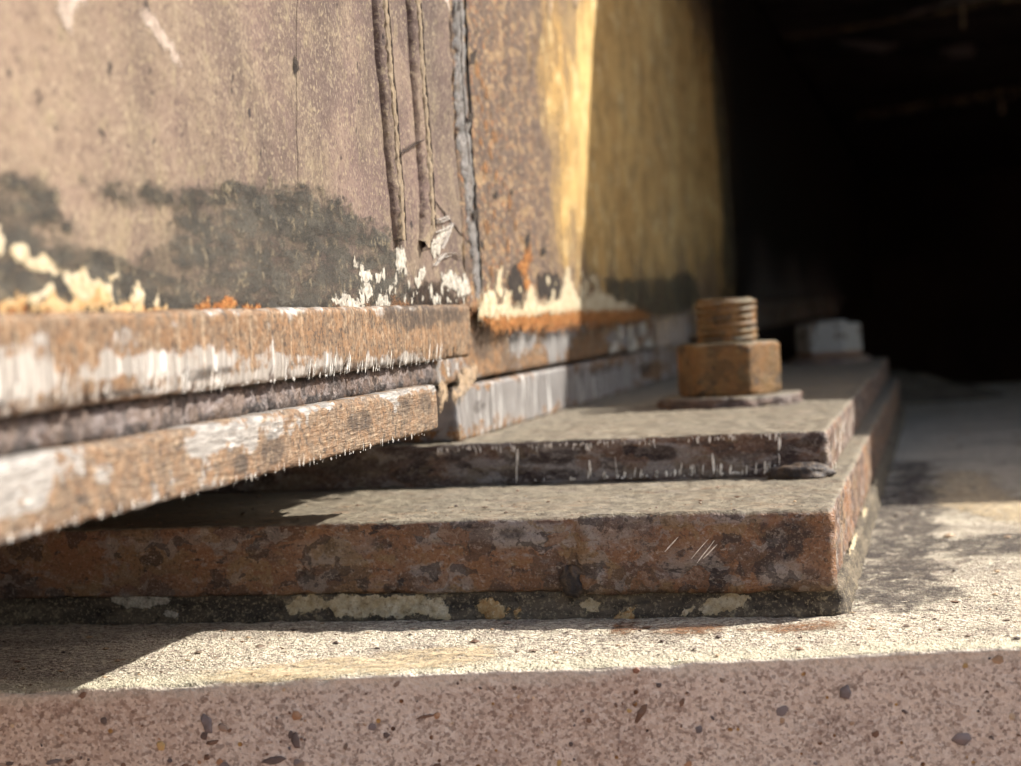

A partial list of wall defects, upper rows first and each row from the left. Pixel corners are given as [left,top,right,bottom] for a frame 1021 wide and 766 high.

crack [436,0,484,301]
damp [0,0,736,348]
corrosion [483,207,532,295]
spalling [508,264,524,306]
spalling [537,271,562,302]
corrosion [461,298,651,336]
corrosion [766,462,836,480]